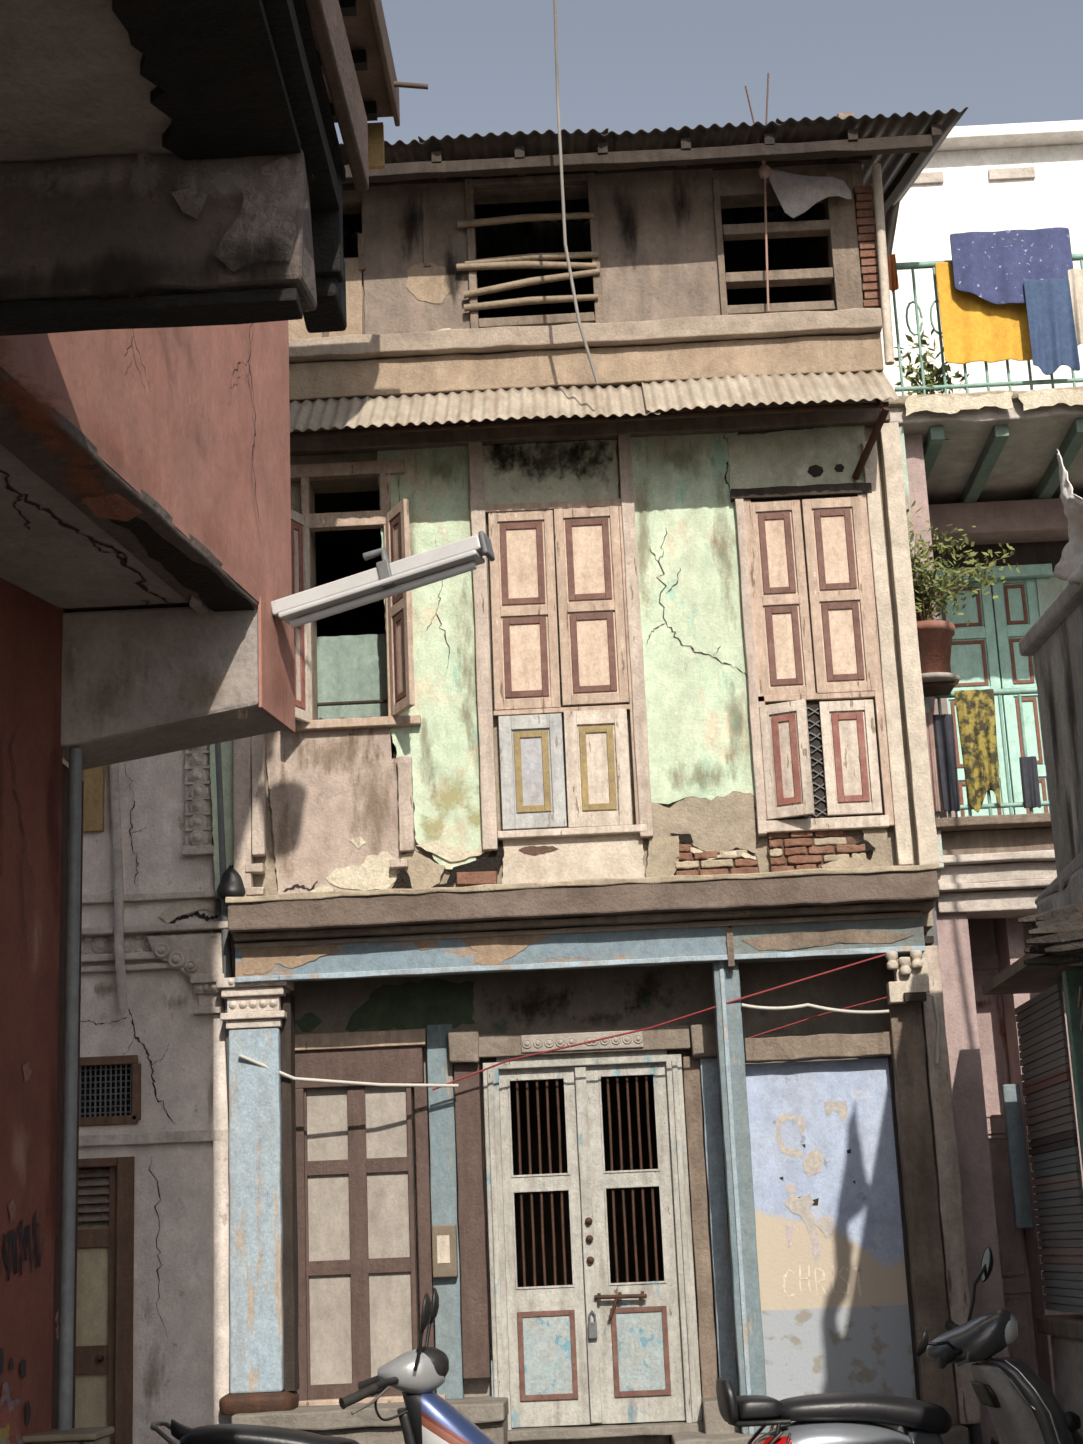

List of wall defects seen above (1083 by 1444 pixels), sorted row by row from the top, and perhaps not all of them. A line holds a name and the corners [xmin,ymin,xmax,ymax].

spalling [112,0,303,272]
damp [446,254,459,295]
damp [618,199,636,248]
damp [491,444,610,479]
crack [0,470,173,608]
crack [646,530,747,676]
peeling [645,791,890,878]
peeling [240,944,339,975]
crack [80,1009,175,1124]
peeling [824,1099,848,1122]
peeling [776,1114,837,1263]
crack [149,1162,168,1347]